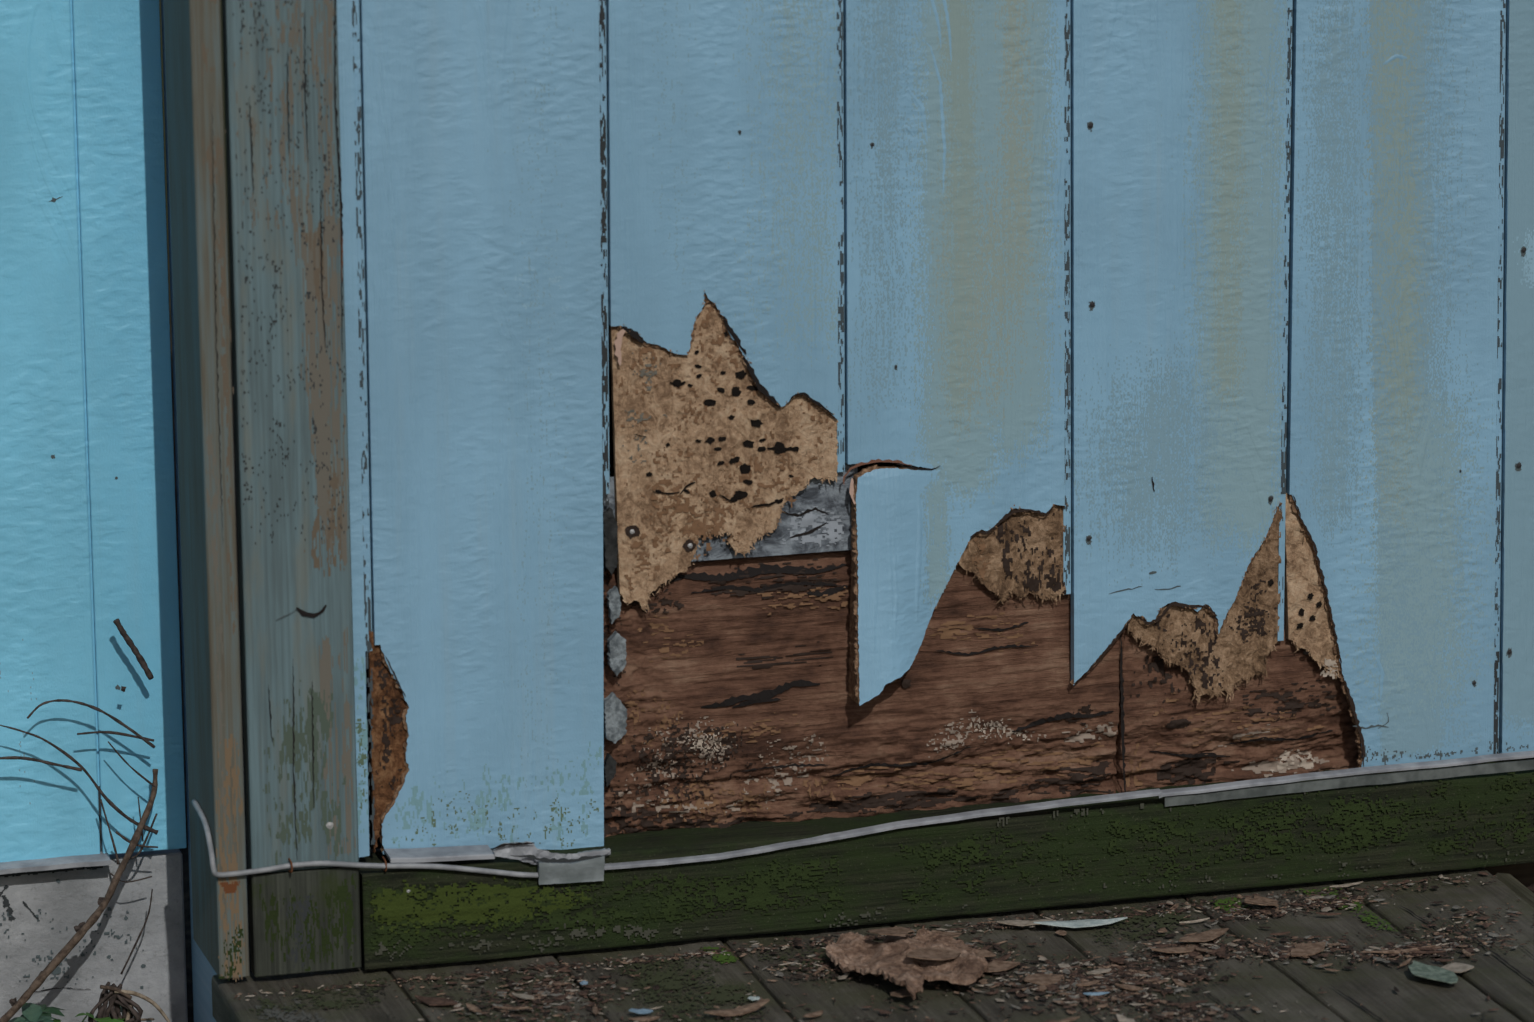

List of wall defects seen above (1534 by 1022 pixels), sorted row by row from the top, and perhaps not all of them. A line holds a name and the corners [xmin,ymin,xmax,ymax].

peeling [202,0,349,577]
spalling [614,293,835,418]
spalling [379,645,409,823]
peeling [603,507,627,787]
peeling [782,464,878,706]
spalling [1092,494,1362,767]
damp [440,920,709,952]